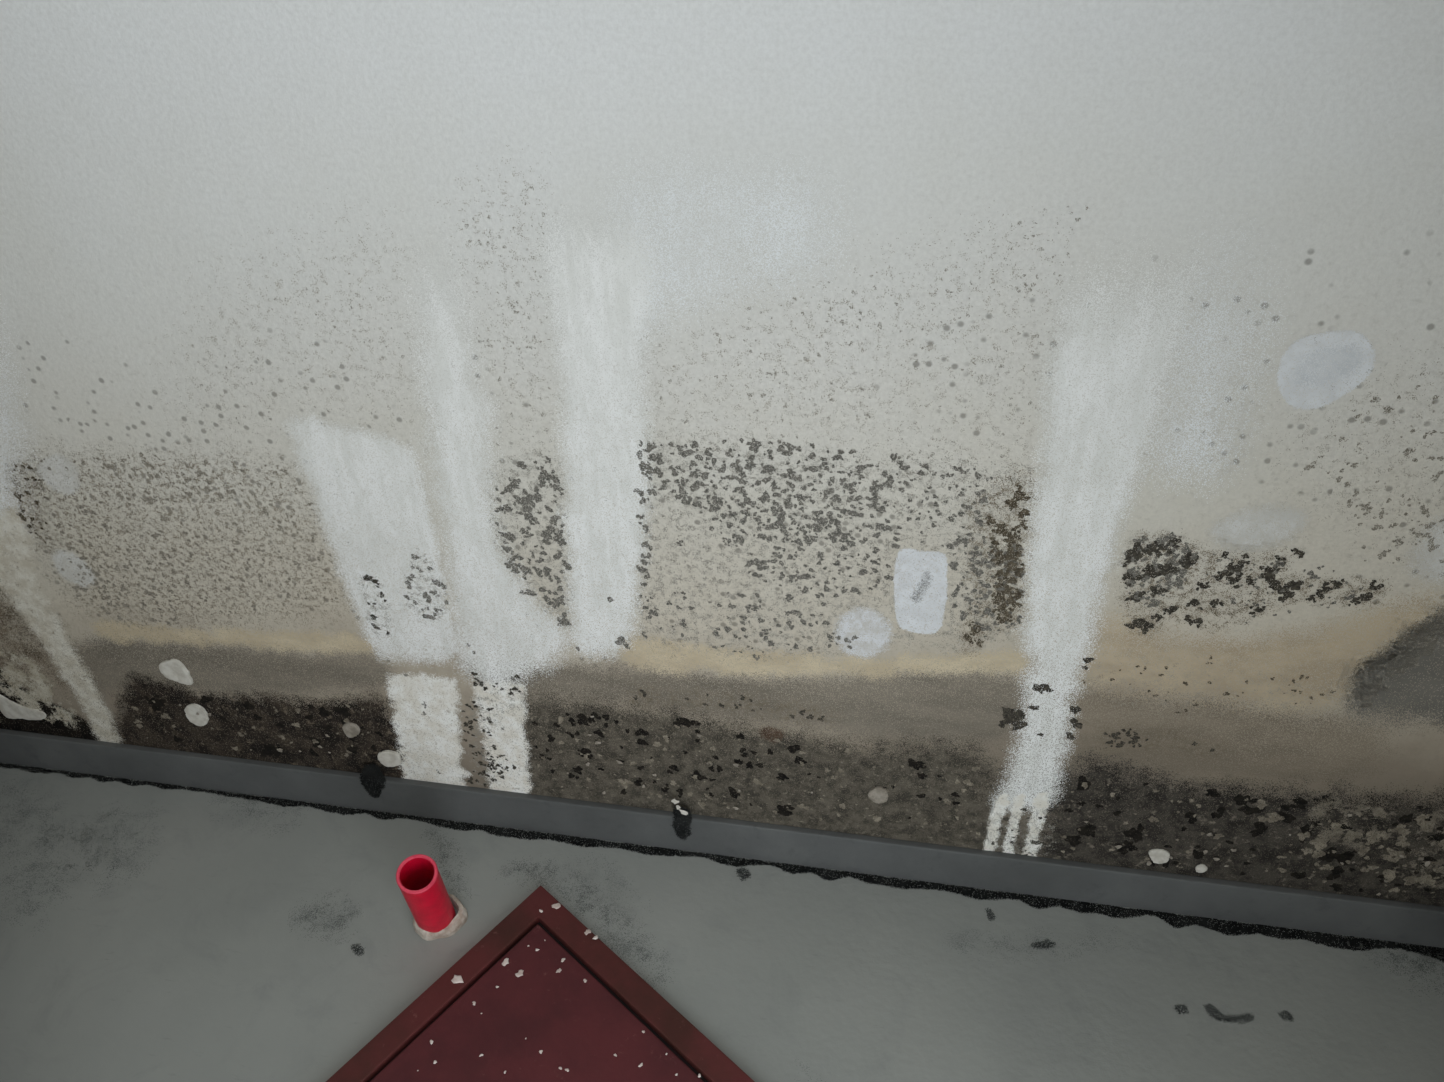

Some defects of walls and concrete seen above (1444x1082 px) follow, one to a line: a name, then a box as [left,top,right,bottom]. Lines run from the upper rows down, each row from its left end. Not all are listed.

leakage [0,188,456,779]
leakage [437,145,575,631]